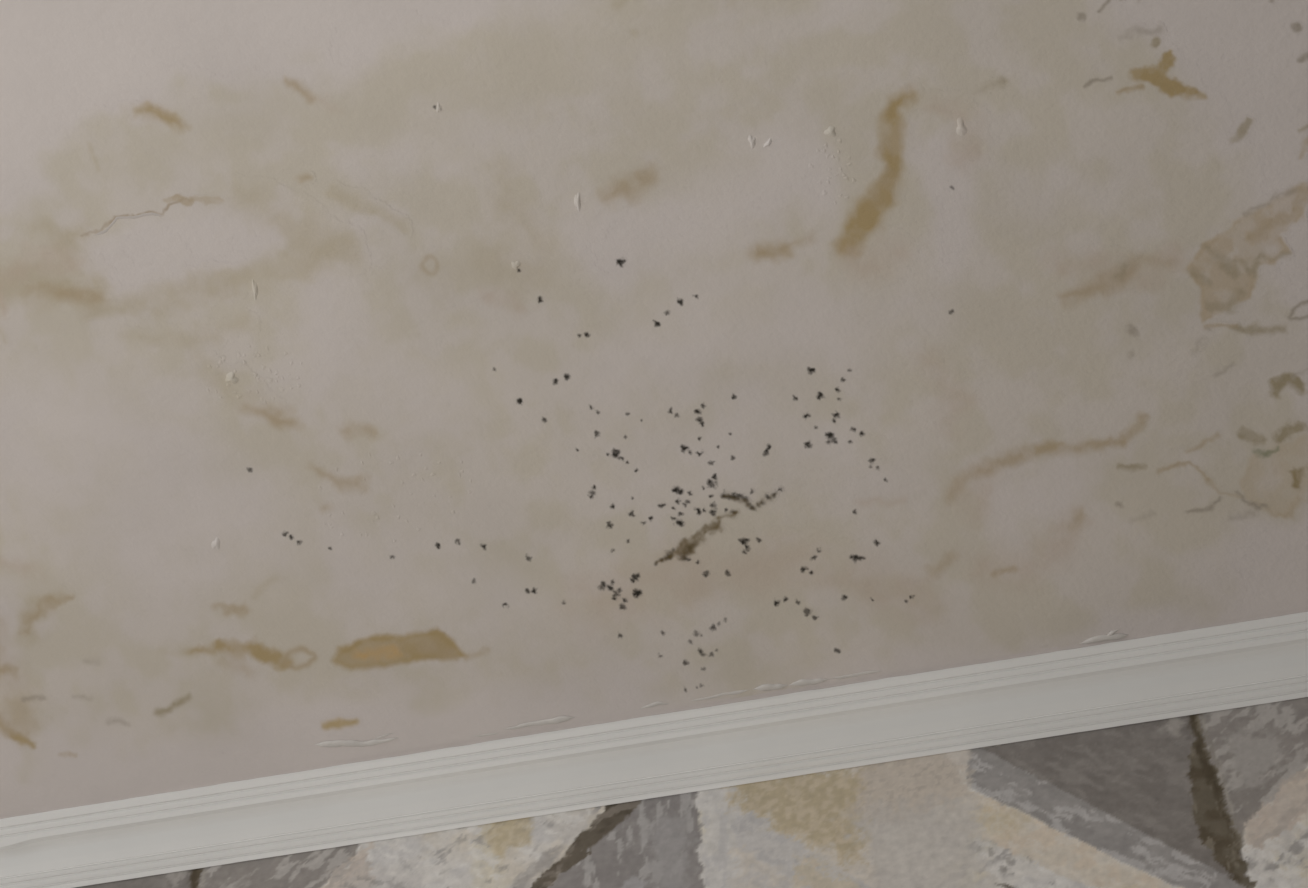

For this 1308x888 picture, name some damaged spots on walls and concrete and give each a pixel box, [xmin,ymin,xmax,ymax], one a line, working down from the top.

peeling [1081,21,1210,104]
water stain [0,0,767,255]
water stain [0,202,244,322]
crack [79,192,227,238]
water stain [220,173,372,281]
water stain [826,79,928,292]
water stain [653,500,741,567]
water stain [719,486,784,513]
water stain [544,524,955,653]
water stain [0,606,58,752]
water stain [155,633,323,683]
water stain [327,622,493,674]